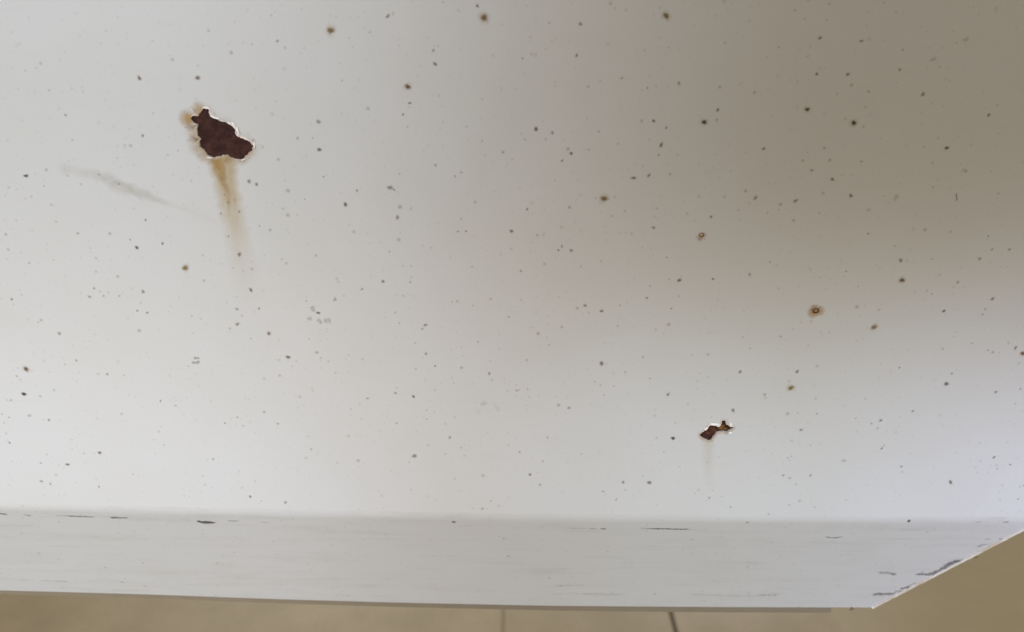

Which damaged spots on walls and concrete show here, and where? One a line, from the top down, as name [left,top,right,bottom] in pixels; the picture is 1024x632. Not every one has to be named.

corrosion [186,106,255,169]